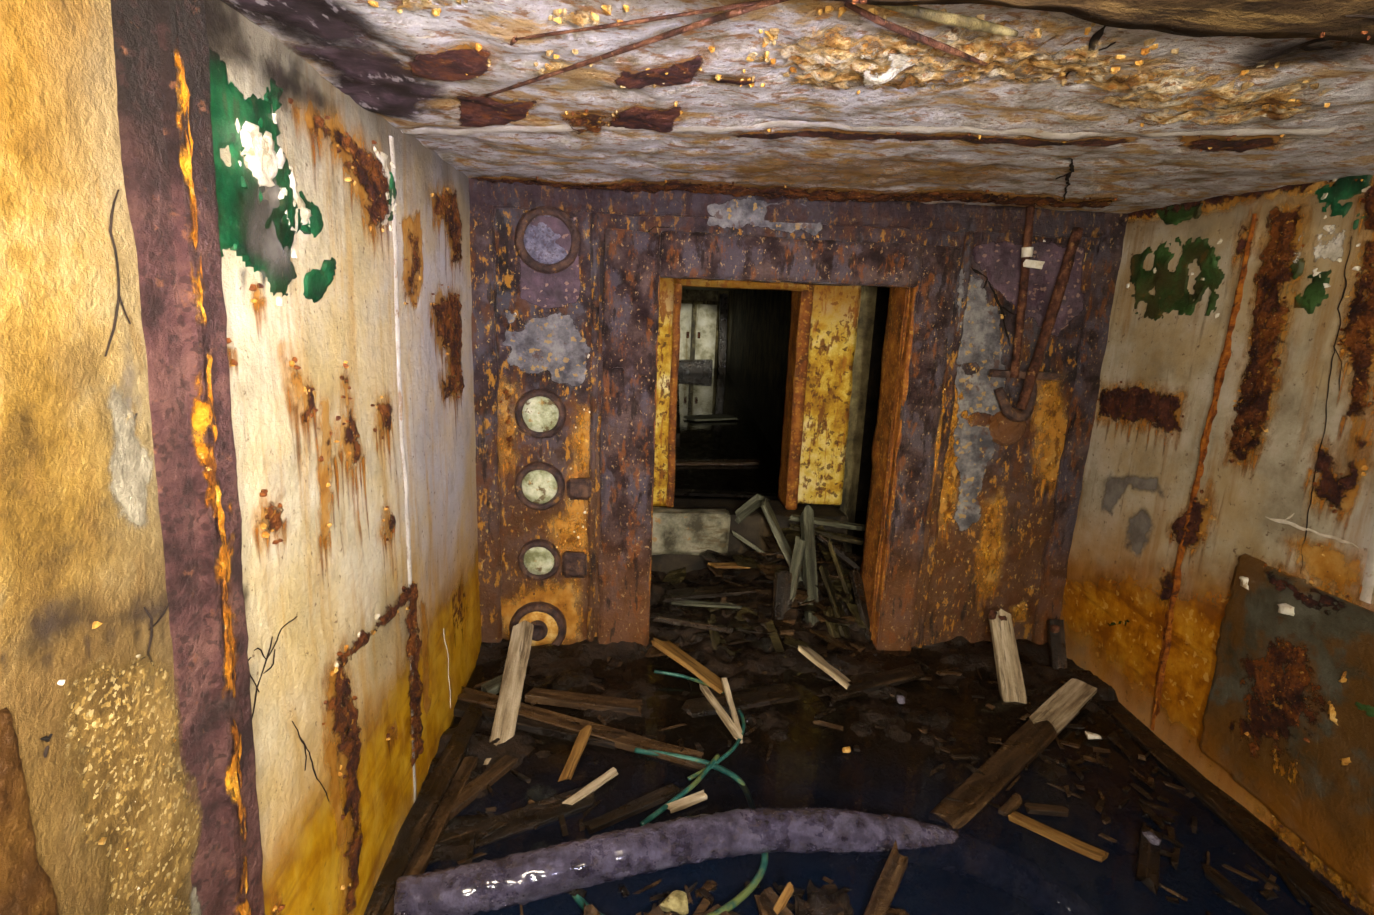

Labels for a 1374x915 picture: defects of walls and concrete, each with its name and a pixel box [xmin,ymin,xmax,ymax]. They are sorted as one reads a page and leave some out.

peeling [209,49,336,306]
corrosion [288,98,465,422]
corrosion [409,42,537,127]
spalling [486,0,789,97]
corrosion [561,46,756,134]
spalling [743,0,1346,127]
peeling [1126,203,1225,321]
peeling [1290,175,1373,314]
corrosion [287,357,396,570]
corrosion [477,175,1336,730]
water stain [263,553,482,915]
corrosion [322,581,431,915]